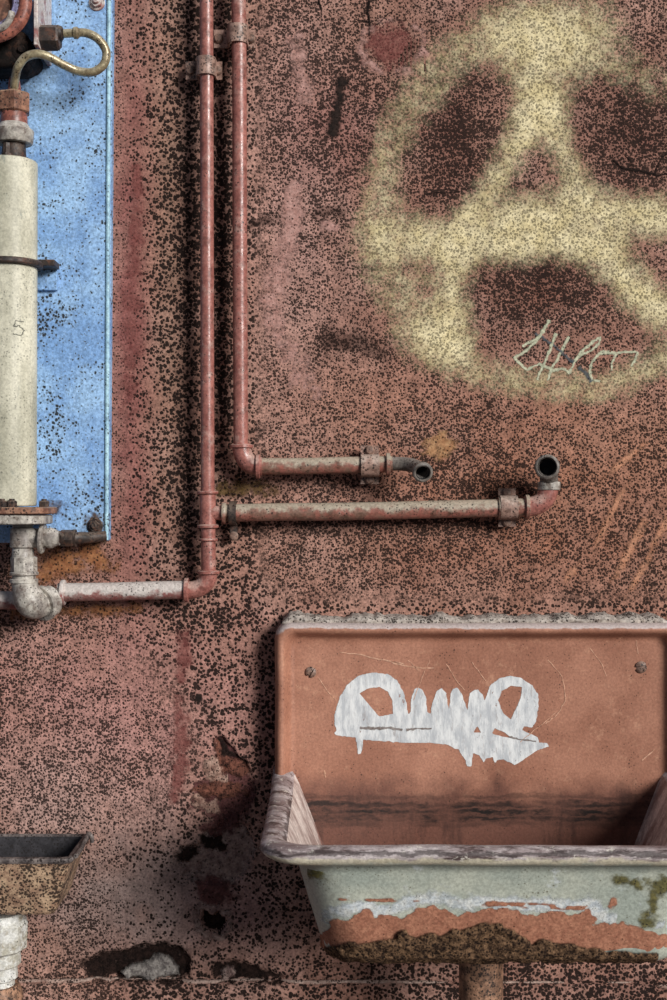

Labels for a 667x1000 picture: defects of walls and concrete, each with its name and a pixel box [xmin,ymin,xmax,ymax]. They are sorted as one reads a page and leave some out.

corrosion [425,431,456,459]
corrosion [37,543,107,582]
flaking render [170,711,259,941]
flaking render [79,942,191,986]